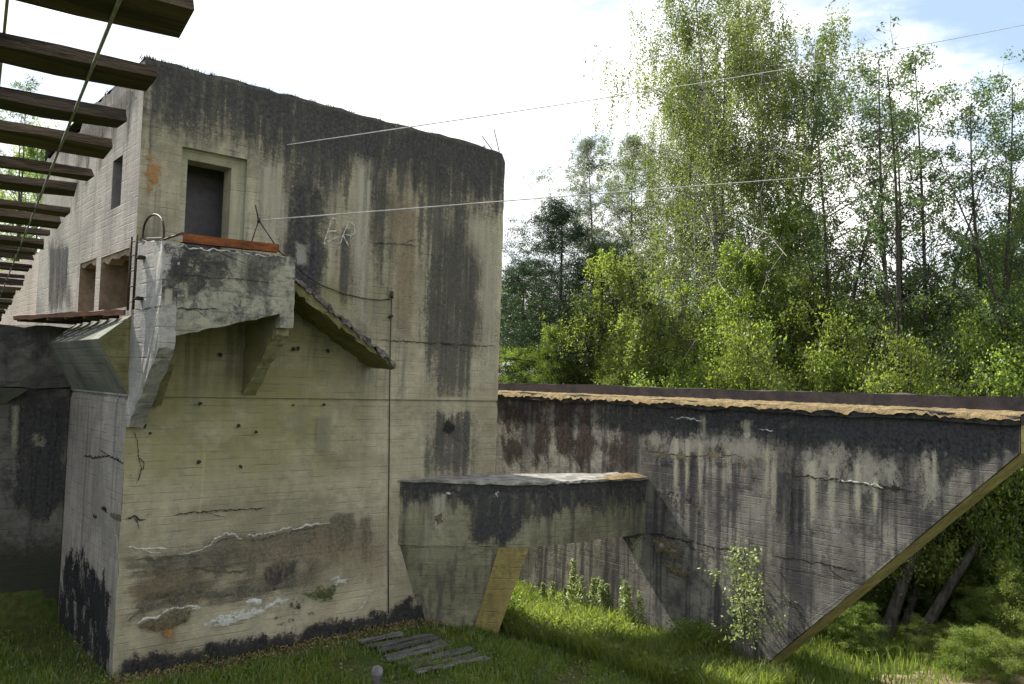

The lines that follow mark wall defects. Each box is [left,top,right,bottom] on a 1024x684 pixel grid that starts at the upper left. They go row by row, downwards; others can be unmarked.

leakage [145,61,505,397]
leakage [2,389,70,521]
crack [83,432,144,483]
crack [177,507,265,517]
leakage [401,402,1019,546]
crack [792,475,918,494]
spalling [139,607,190,633]
leakage [121,513,383,627]